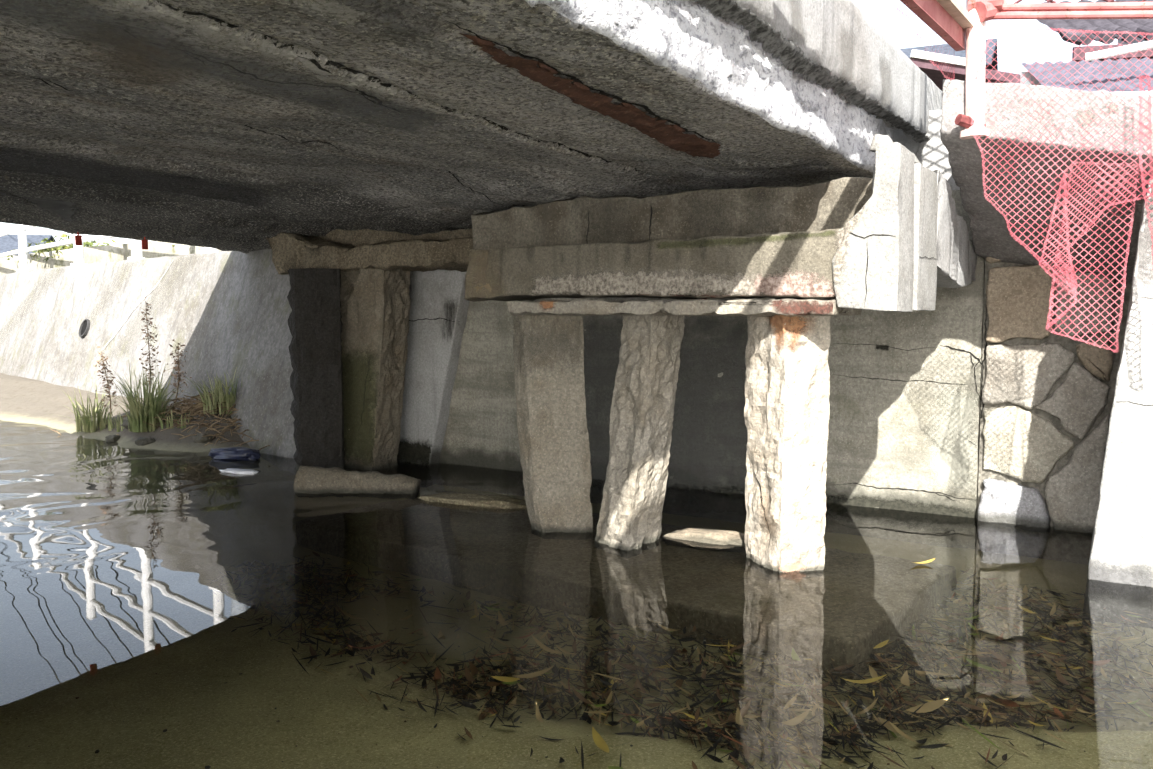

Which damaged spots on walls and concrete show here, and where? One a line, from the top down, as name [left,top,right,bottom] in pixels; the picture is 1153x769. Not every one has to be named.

crack [90,1,650,174]
rust [445,20,721,158]
rust [769,299,837,349]
crack [850,232,892,301]
crack [833,290,987,446]
crack [752,467,770,543]